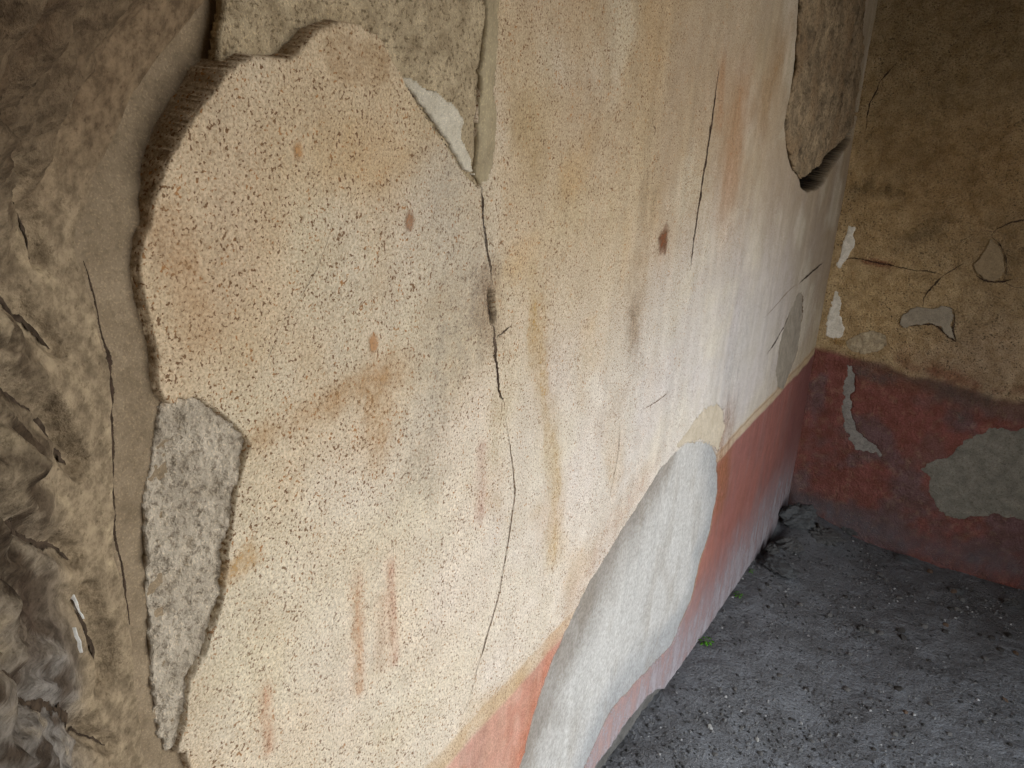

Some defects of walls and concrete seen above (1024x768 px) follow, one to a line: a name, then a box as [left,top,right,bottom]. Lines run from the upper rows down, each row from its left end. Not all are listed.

crack [690,72,719,269]
flaking render [0,0,486,768]
crack [477,185,493,285]
crack [493,326,511,402]
corrosion [659,229,667,253]
peeling [776,293,803,389]
crack [846,258,964,303]
peeling [900,306,956,342]
crack [83,261,130,625]
flaking render [921,428,1024,520]
crack [466,428,516,706]
flaking render [519,404,725,768]